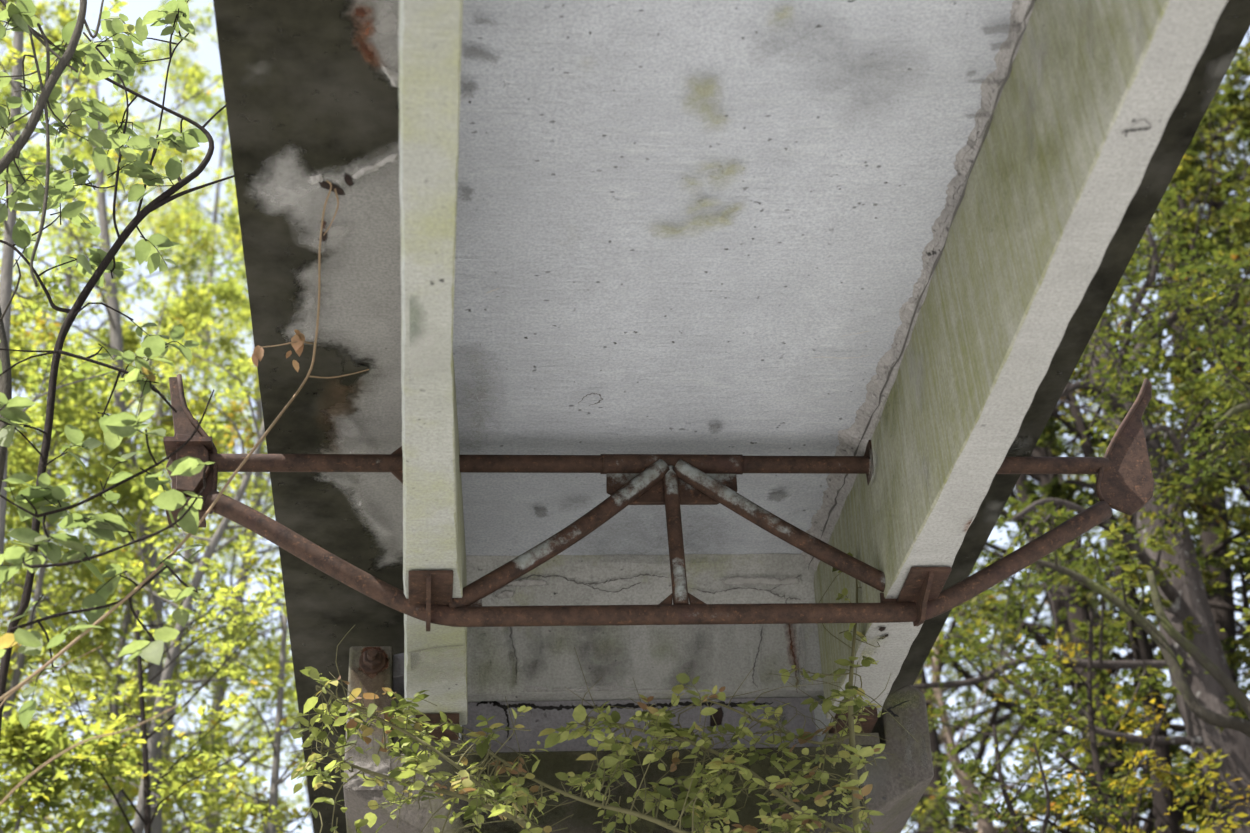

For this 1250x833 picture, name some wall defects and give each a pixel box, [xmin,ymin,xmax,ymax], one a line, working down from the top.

water stain [213,0,400,454]
water stain [270,472,404,591]
water stain [279,547,404,833]
rust [354,647,389,716]